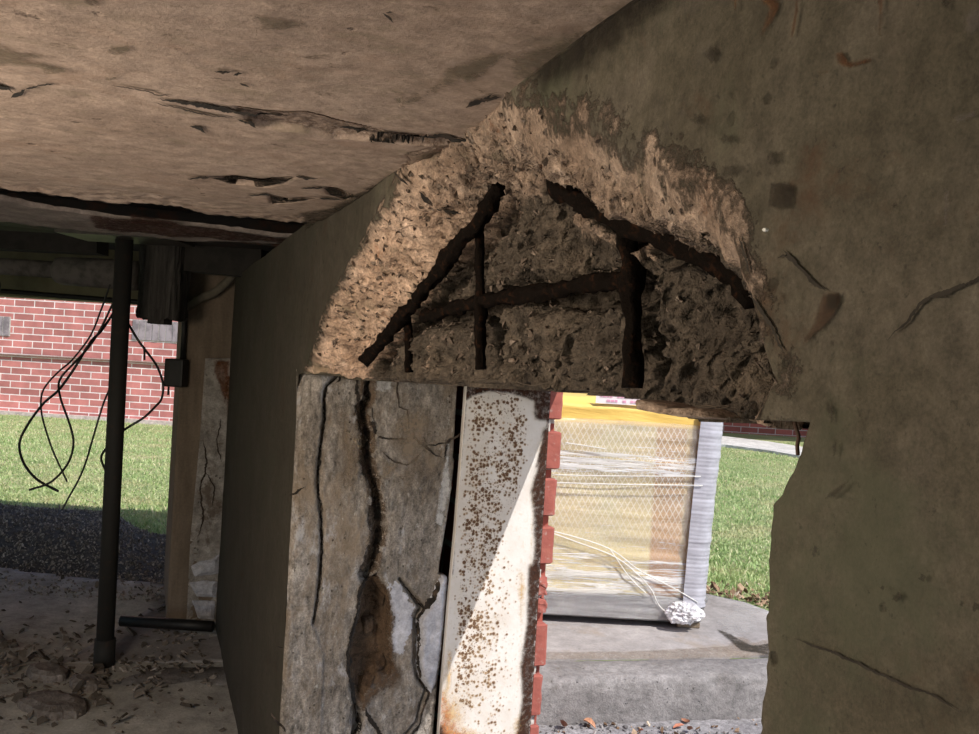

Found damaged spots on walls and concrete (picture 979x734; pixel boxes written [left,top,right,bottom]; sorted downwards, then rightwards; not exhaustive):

crack [0,83,52,98]
crack [112,71,466,148]
spalling [303,92,810,430]
crack [290,376,461,621]
rust [439,386,551,734]
crack [352,708,382,734]
spalling [346,572,415,713]
crack [402,580,440,734]